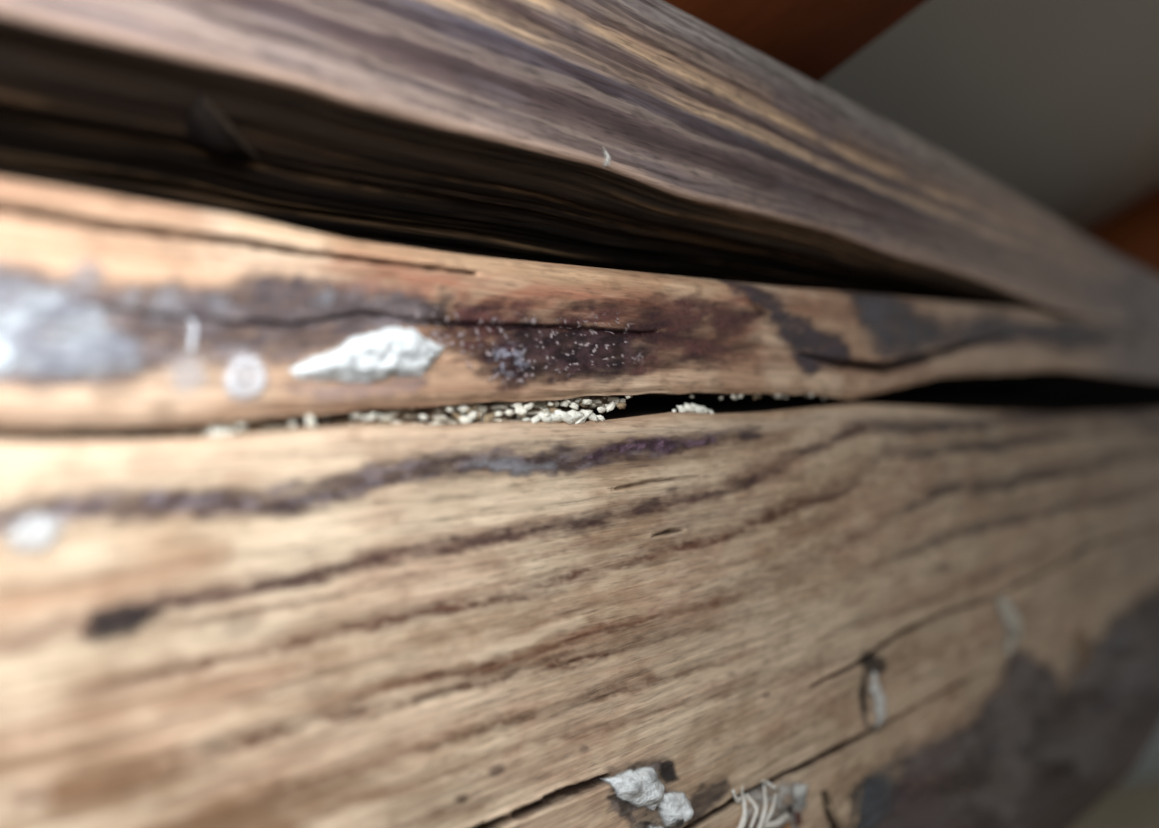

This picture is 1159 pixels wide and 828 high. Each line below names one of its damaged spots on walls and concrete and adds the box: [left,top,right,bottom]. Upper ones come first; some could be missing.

water stain [0,269,851,388]
crack [0,342,1159,441]
crack [810,605,967,687]
crack [473,775,605,828]
crack [683,711,905,828]
water stain [852,594,1159,828]